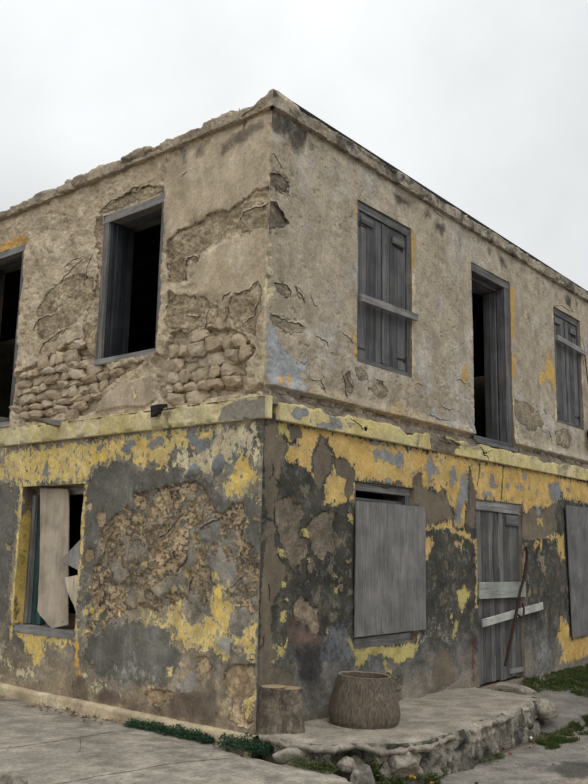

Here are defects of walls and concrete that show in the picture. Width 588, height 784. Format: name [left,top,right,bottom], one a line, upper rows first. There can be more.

crack [61,254,93,283]